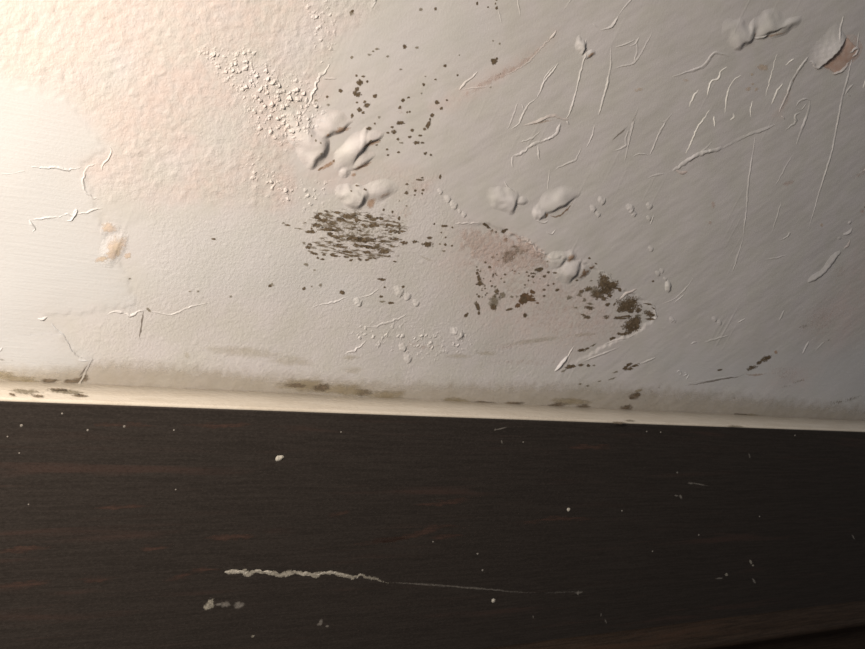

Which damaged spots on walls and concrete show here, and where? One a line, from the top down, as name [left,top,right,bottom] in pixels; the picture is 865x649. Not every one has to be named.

mould [282,208,453,271]
mould [464,223,658,340]